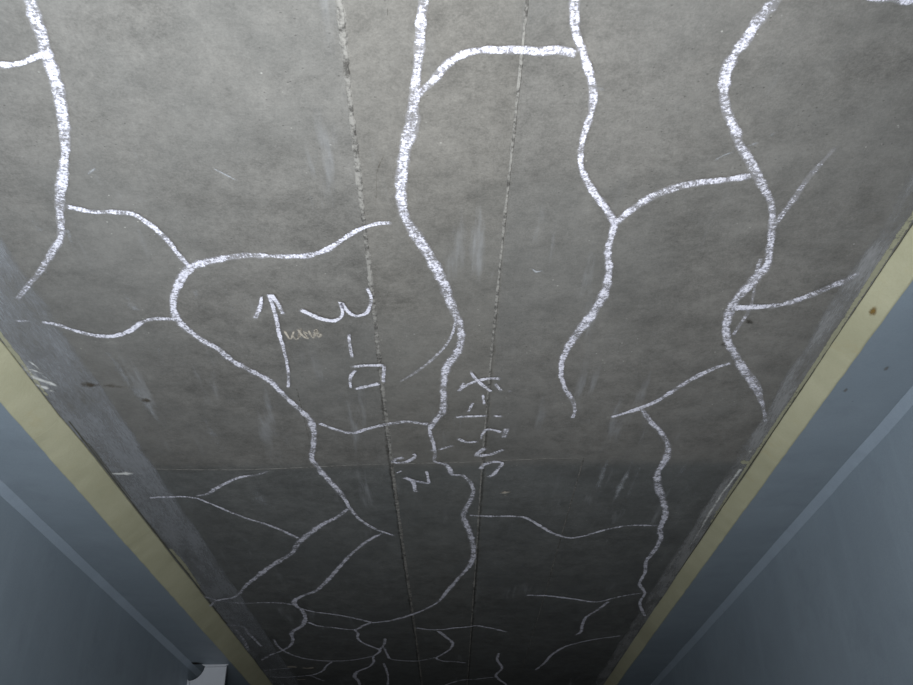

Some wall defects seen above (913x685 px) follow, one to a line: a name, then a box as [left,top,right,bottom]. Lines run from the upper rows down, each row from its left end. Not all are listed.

crack [0,0,243,368]
crack [151,0,819,685]
crack [870,0,913,8]